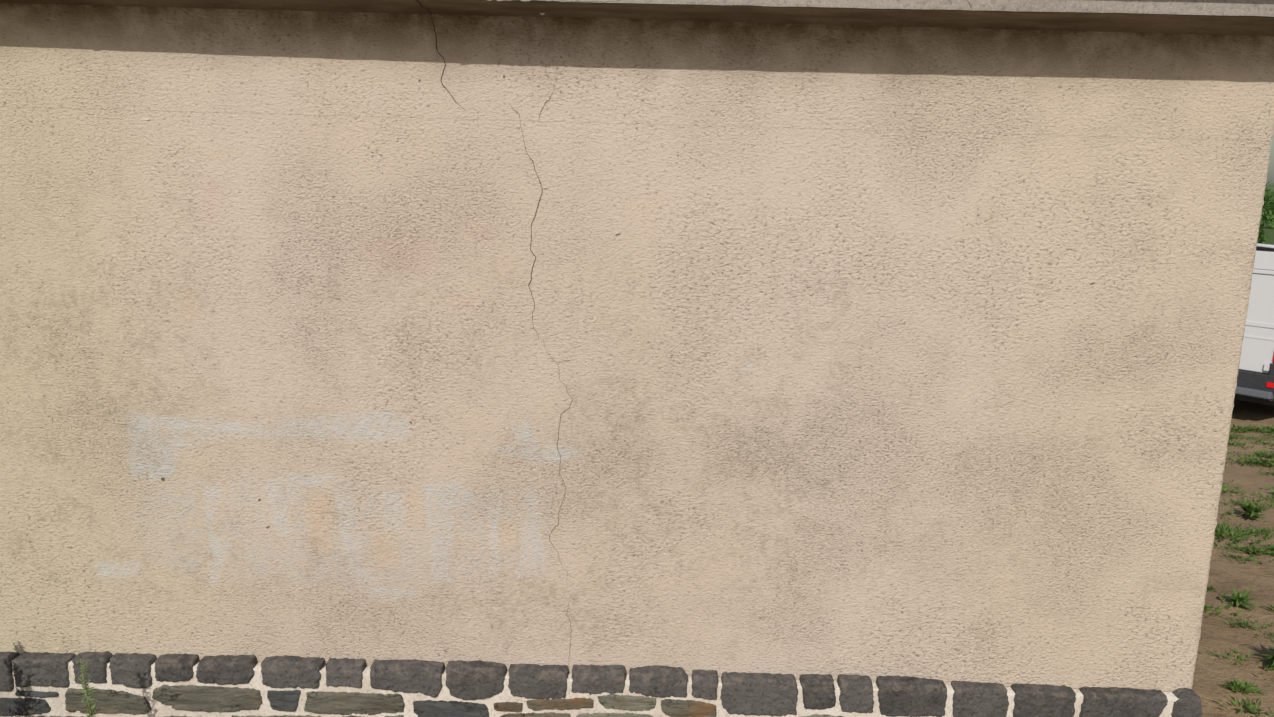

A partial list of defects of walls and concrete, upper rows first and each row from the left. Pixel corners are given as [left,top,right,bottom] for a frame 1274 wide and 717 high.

crack [406,0,465,110]